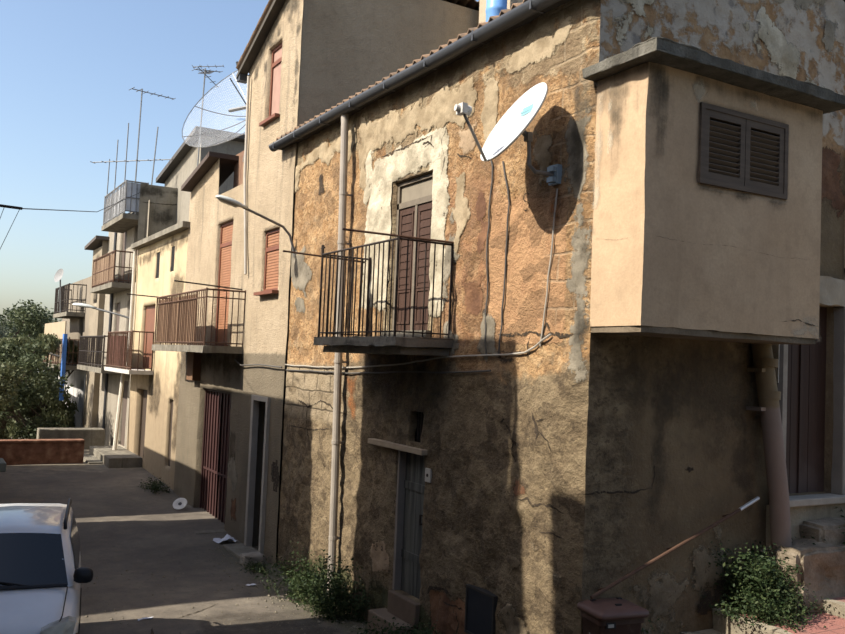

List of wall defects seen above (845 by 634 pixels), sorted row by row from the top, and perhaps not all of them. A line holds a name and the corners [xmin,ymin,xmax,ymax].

peeling [613,0,655,47]
peeling [739,6,822,87]
peeling [290,15,572,363]
leakage [561,87,600,382]
crack [290,398,333,437]
crack [580,465,655,495]